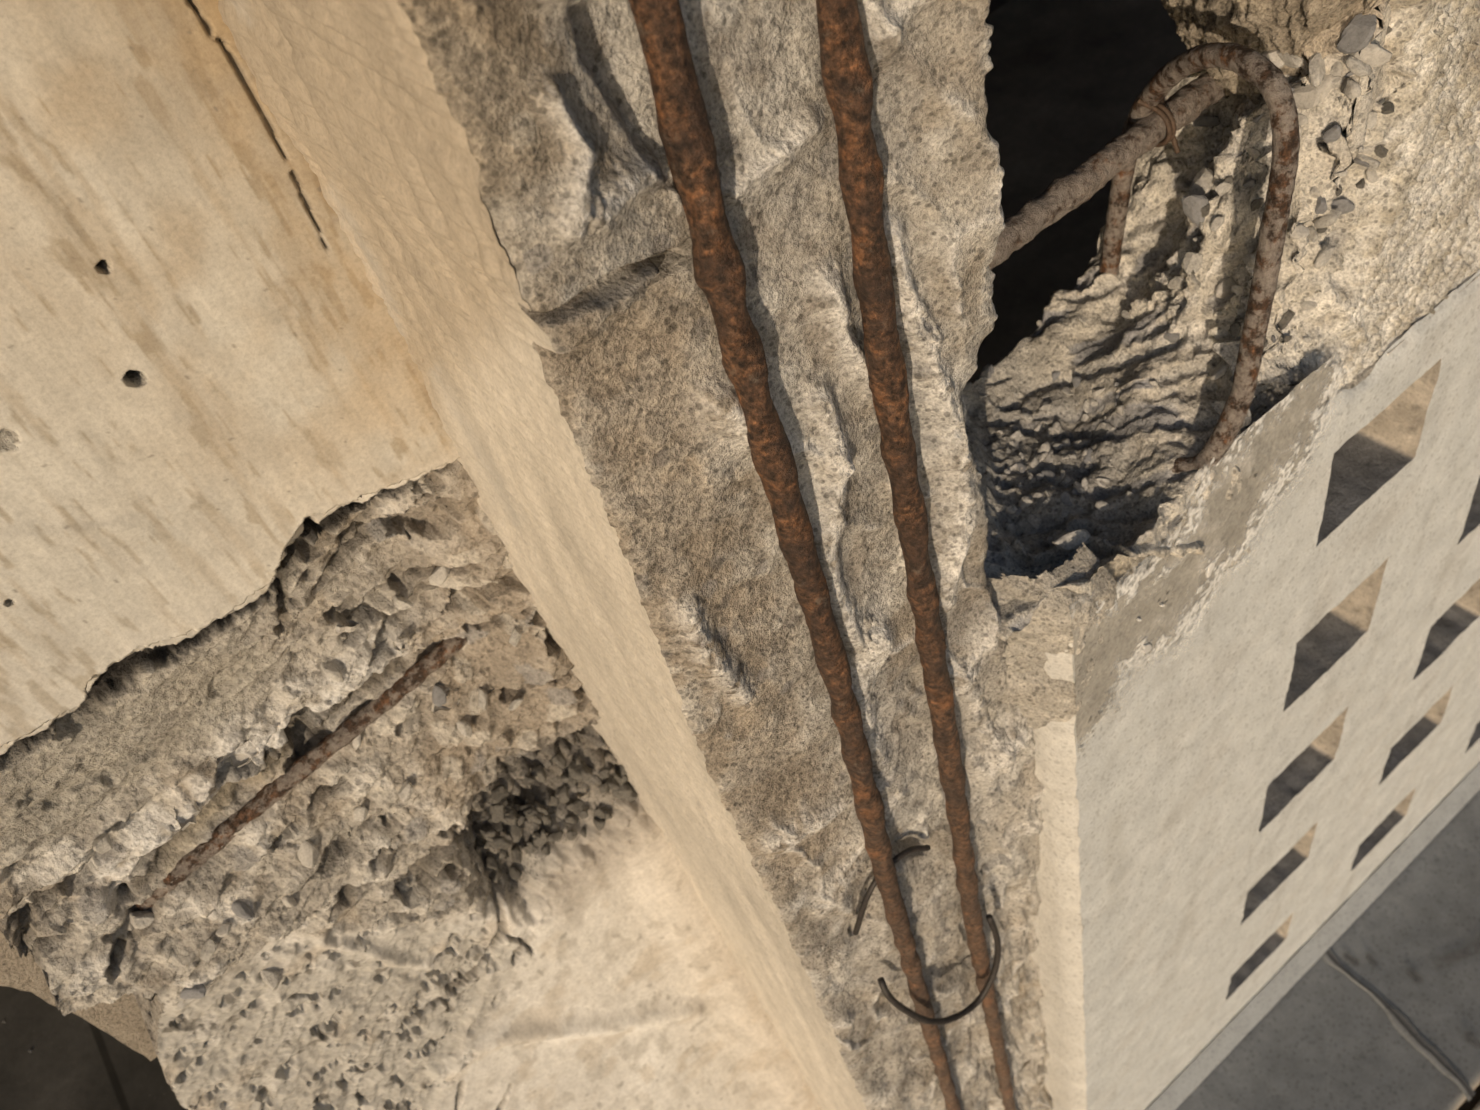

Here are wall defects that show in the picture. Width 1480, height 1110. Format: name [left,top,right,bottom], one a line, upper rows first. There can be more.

spalling [0,462,601,1104]
spalling [397,0,1394,1110]